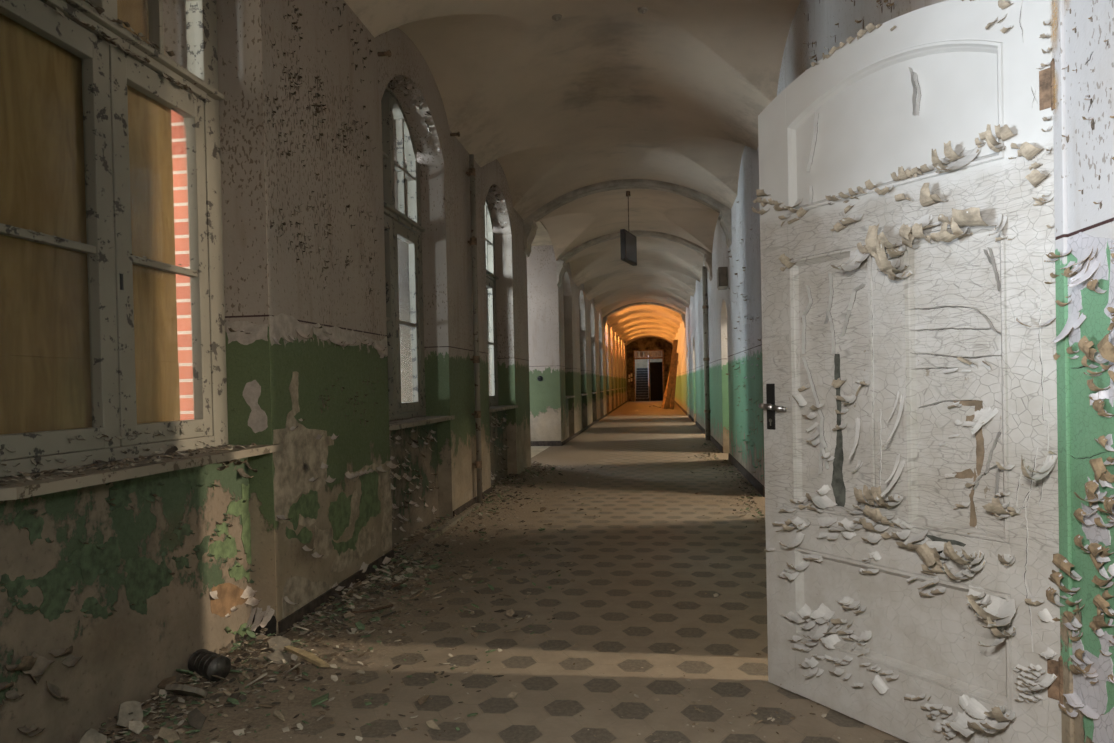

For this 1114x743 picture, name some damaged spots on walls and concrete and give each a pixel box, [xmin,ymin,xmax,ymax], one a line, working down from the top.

peeling [1036,19,1094,73]
flaking render [167,371,439,639]
peeling [226,313,388,358]
peeling [266,0,439,299]
crack [801,272,882,486]
peeling [764,354,1114,743]
crack [917,400,965,408]
peeling [825,116,1069,281]
crack [907,306,1002,370]
crack [983,247,1001,291]
crack [972,286,1107,652]
peeling [1016,232,1114,418]